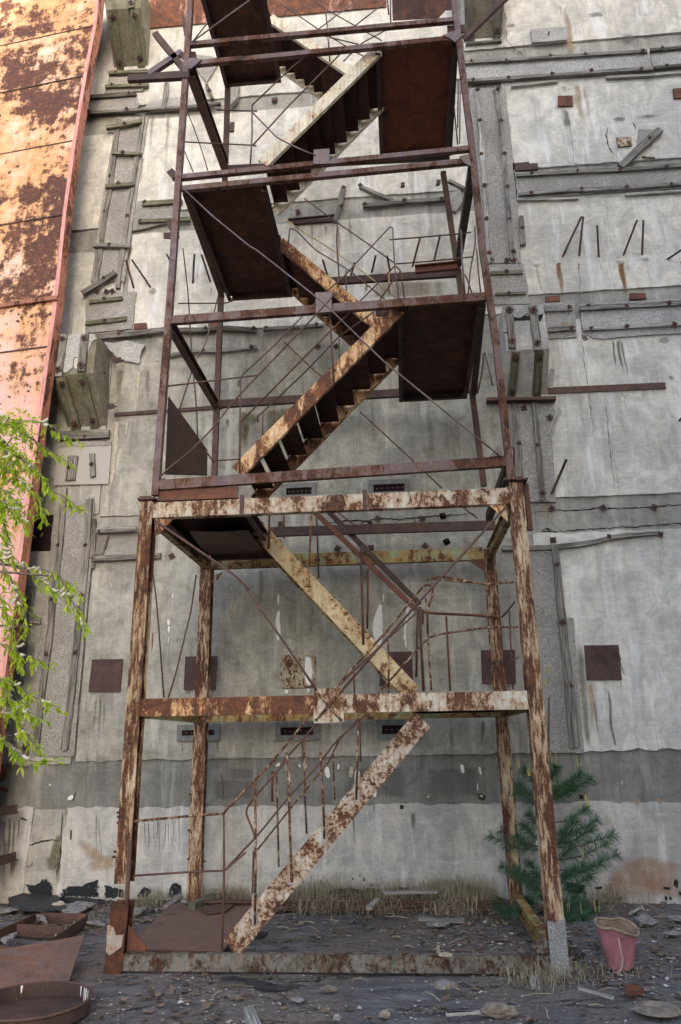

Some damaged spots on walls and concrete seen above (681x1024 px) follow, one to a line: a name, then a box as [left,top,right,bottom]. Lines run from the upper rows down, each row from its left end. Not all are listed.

crack [539,265,681,532]
peeling [26,879,124,924]
peeling [396,913,531,953]
peeling [92,971,526,1024]
peeling [537,925,680,1023]